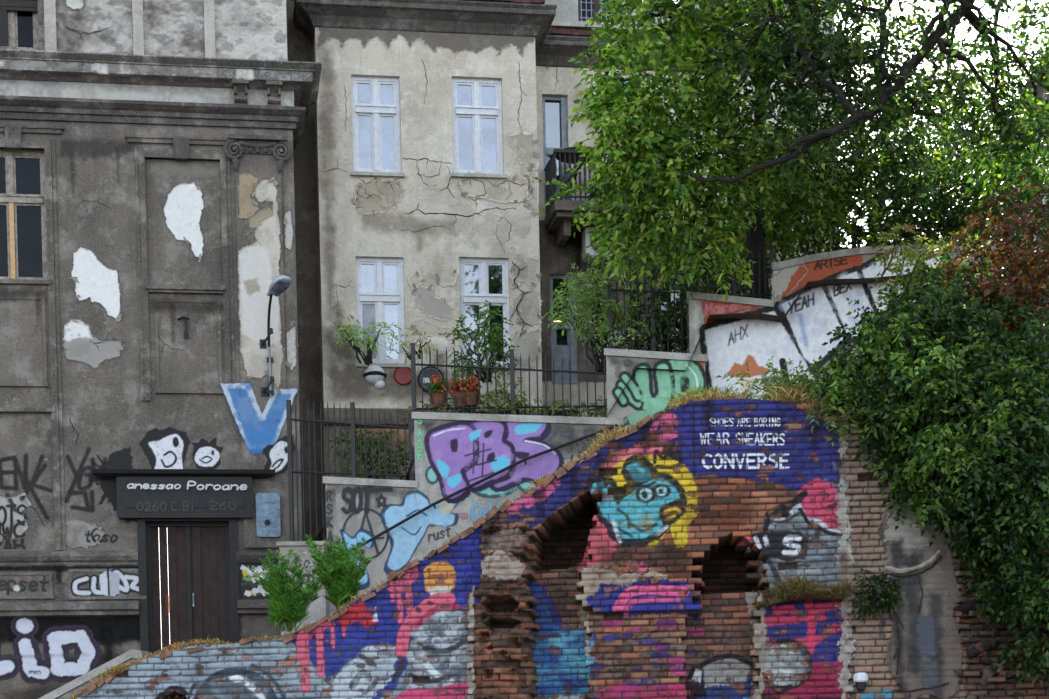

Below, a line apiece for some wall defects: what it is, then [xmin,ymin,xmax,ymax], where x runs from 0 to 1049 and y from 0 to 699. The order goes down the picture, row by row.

peeling [70,246,122,322]
peeling [163,181,205,262]
peeling [237,172,298,395]
peeling [351,178,405,216]
crack [328,158,534,338]
peeling [407,267,459,341]
peeling [62,319,124,369]
spalling [481,530,526,581]
spalling [488,599,519,628]